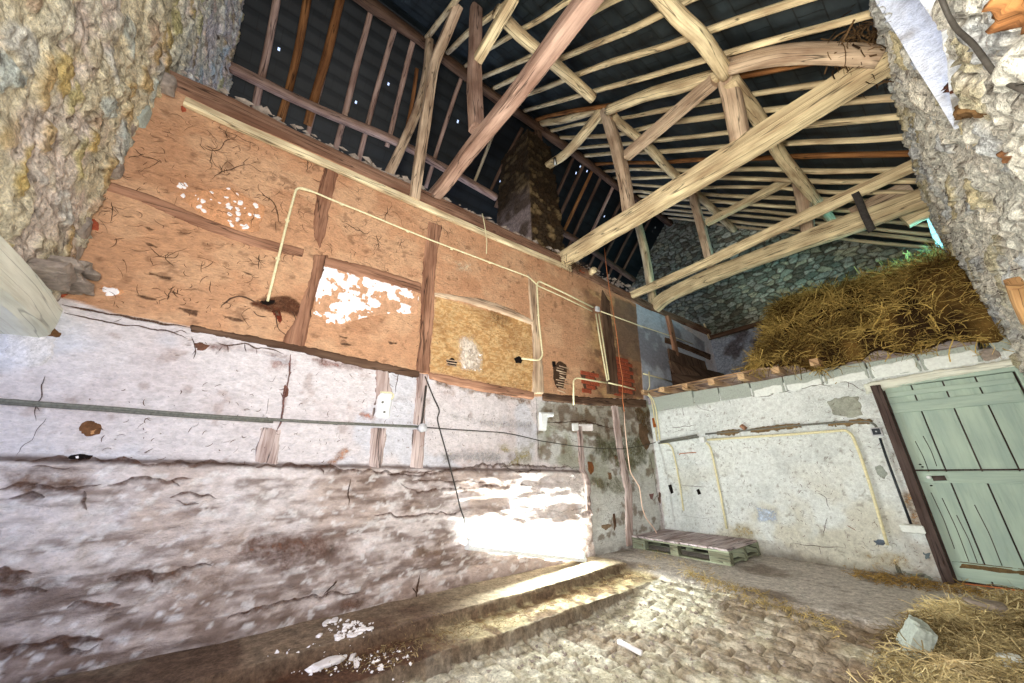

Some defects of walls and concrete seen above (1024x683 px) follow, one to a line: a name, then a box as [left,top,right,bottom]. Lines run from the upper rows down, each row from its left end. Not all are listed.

peeling [176,182,266,232]
peeling [313,267,419,346]
crack [64,295,323,430]
flaking render [580,370,600,394]
flaking render [614,356,636,396]
damp [592,408,653,492]